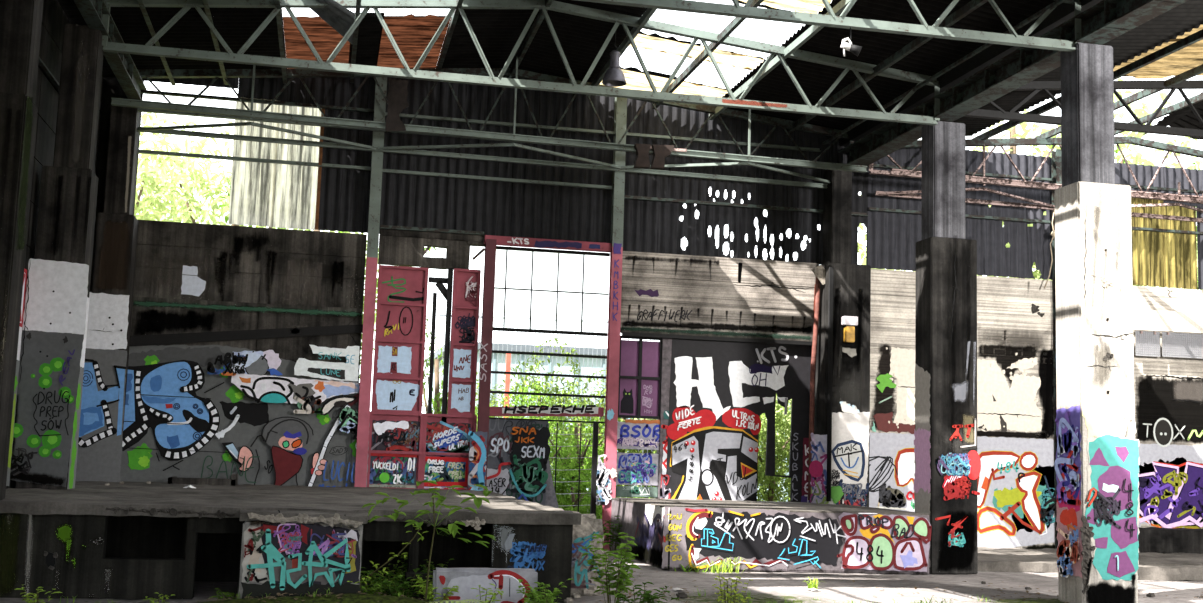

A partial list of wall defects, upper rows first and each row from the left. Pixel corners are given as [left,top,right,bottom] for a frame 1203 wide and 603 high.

water stain [150,234,344,304]
peeling [977,353,1042,432]